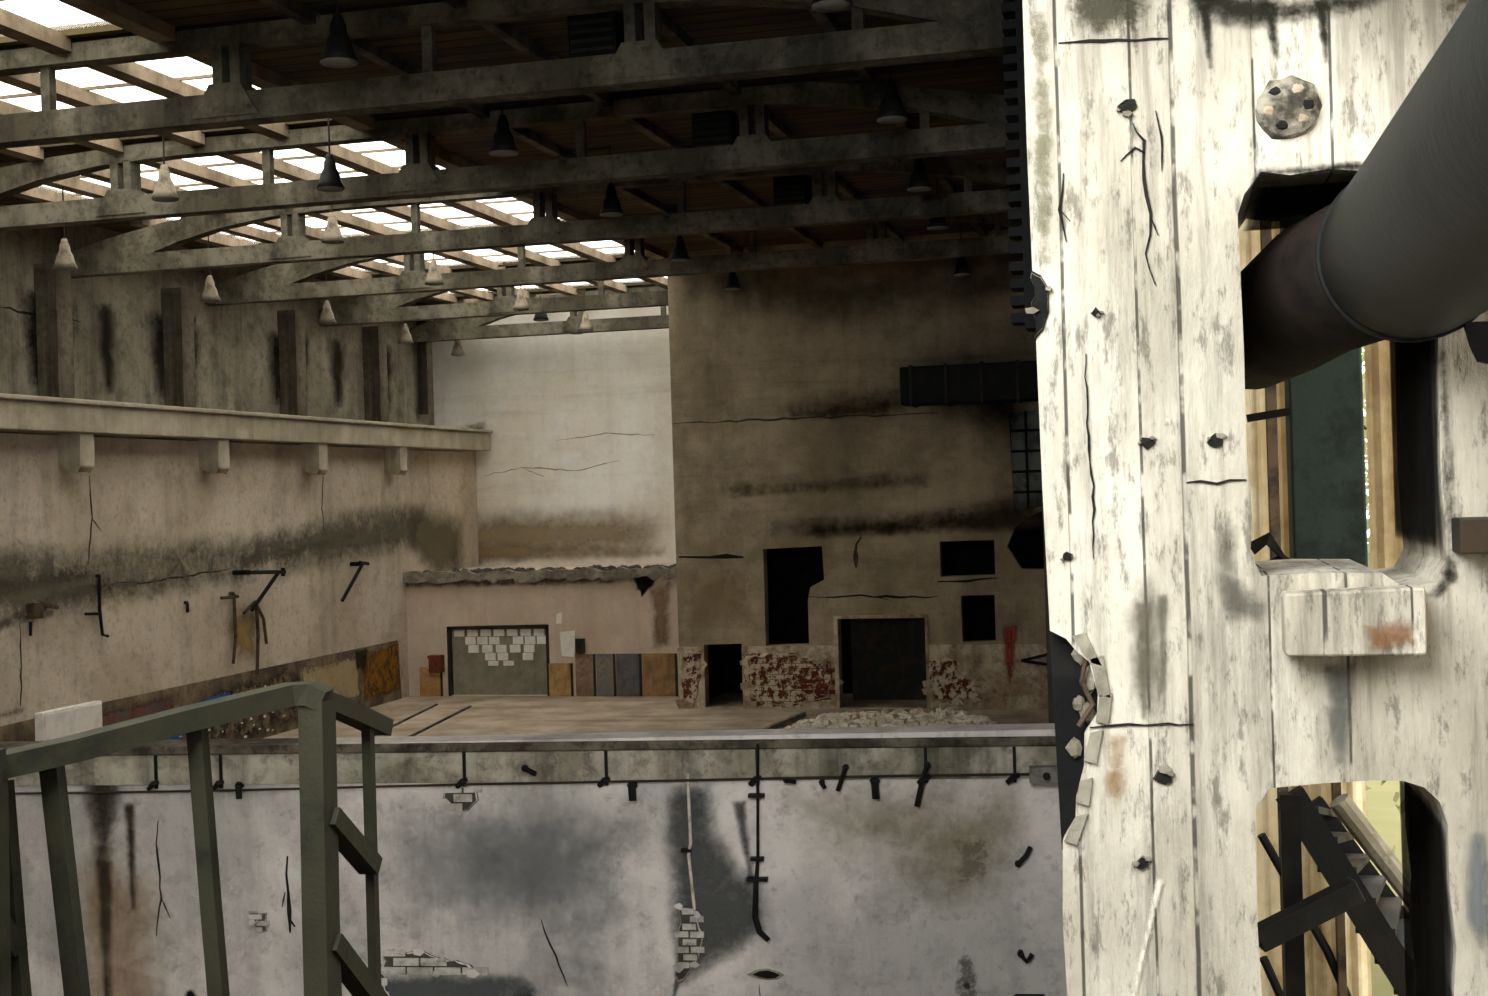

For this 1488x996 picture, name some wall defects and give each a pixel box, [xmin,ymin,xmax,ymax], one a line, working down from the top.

leakage [1126,0,1136,43]
crack [1121,110,1163,284]
leakage [97,306,114,390]
leakage [814,509,1043,534]
leakage [0,510,649,629]
rust [1372,624,1411,648]
spalling [1048,611,1112,850]